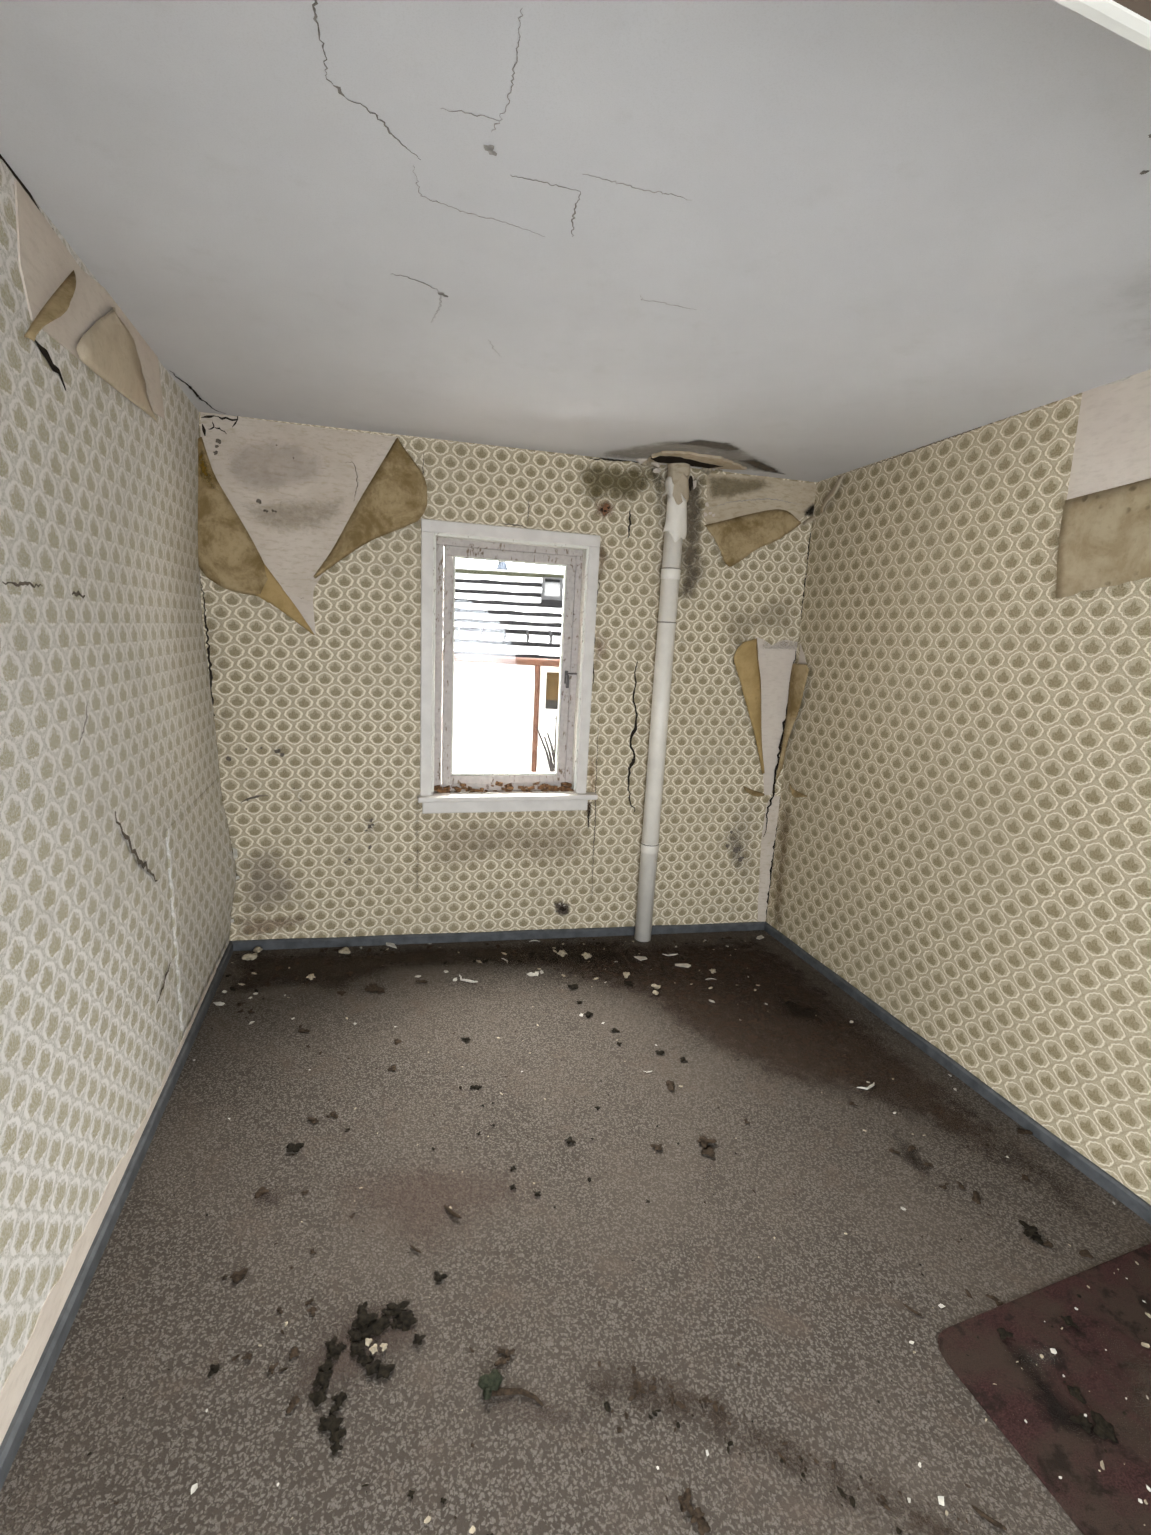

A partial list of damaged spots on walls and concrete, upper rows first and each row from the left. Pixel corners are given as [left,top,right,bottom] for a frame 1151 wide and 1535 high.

crack [312,0,687,237]
damp [585,469,661,498]
flaking render [636,440,778,491]
crack [627,661,638,812]